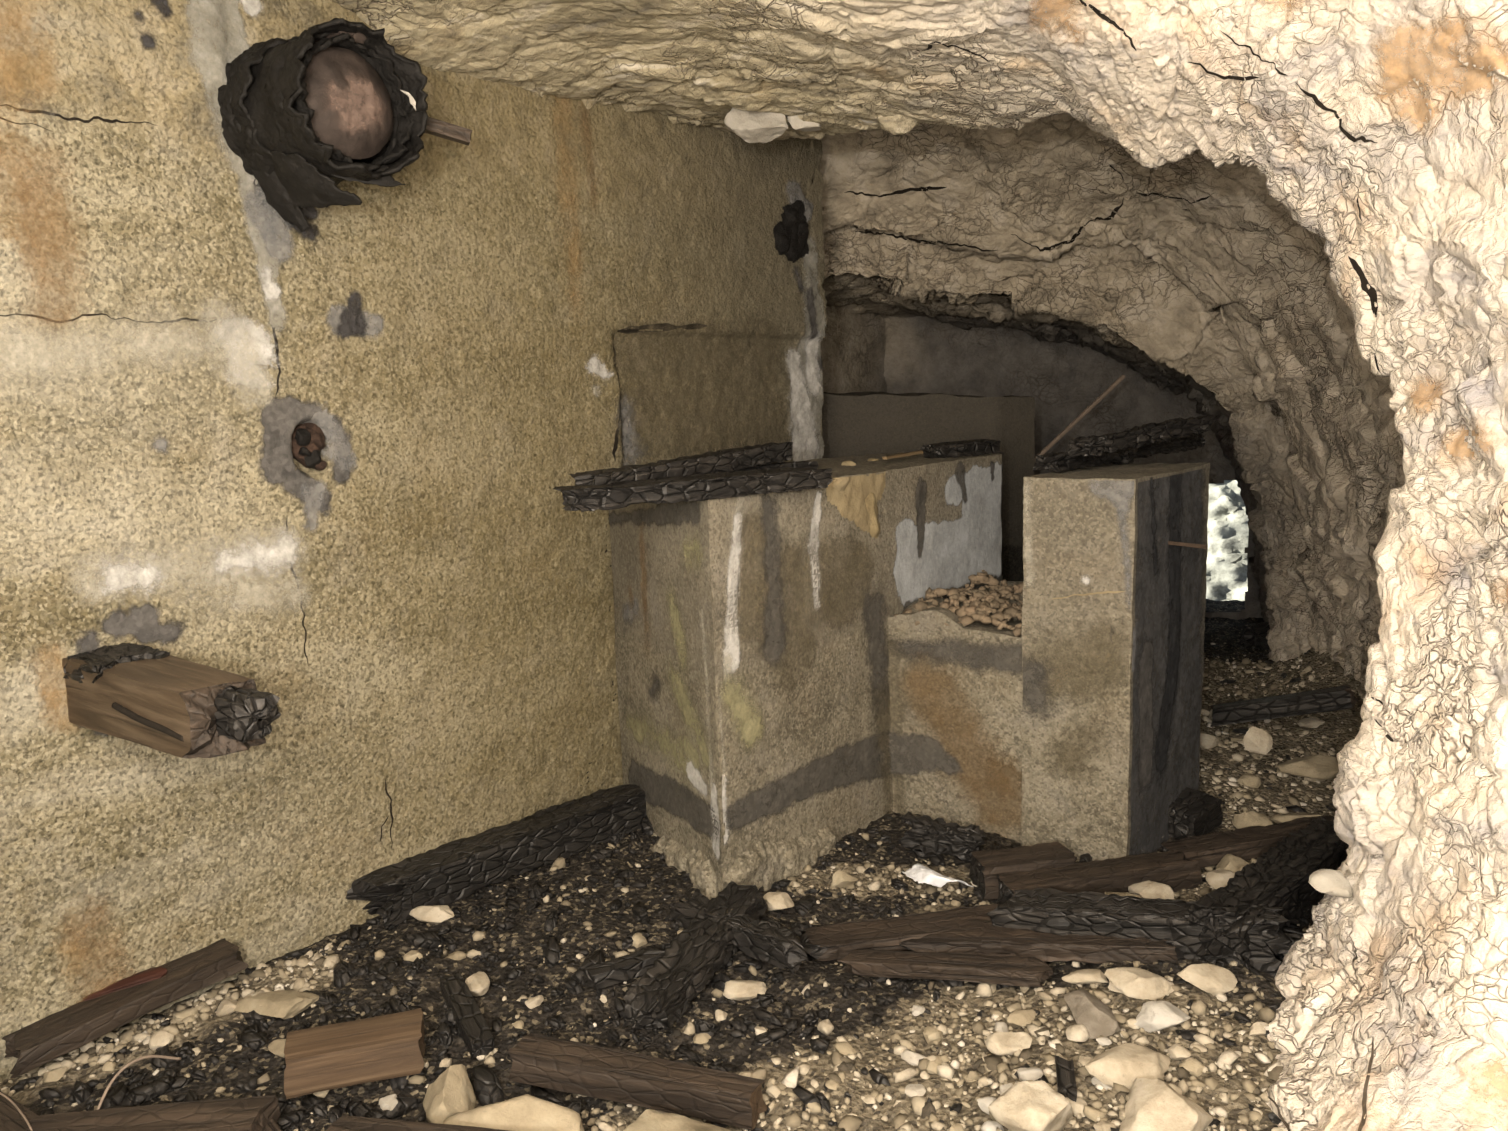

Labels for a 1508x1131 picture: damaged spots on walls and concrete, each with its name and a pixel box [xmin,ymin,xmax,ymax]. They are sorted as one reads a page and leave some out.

crack [1079,0,1136,51]
leakage [609,501,700,526]
leakage [628,491,1154,858]